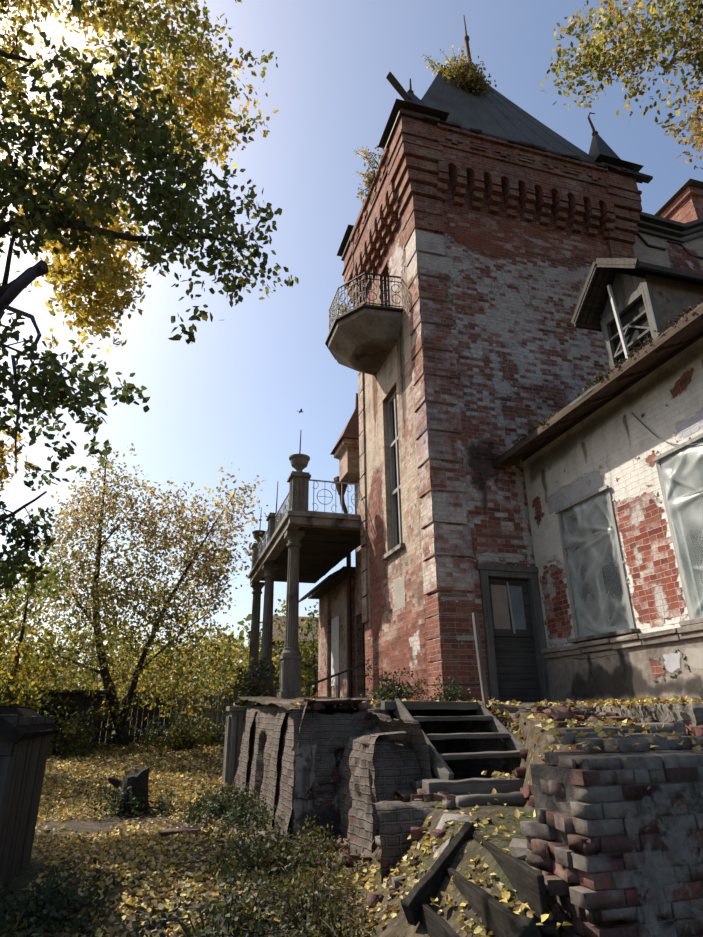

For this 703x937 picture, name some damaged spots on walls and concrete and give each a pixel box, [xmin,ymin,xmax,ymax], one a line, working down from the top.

spalling [445,210,611,329]
peeling [487,344,521,398]
spalling [666,368,695,407]
peeling [532,464,603,536]
peeling [473,550,530,566]
spalling [612,485,688,628]
spalling [540,554,572,647]
leakage [569,651,703,699]
leakage [625,811,703,934]